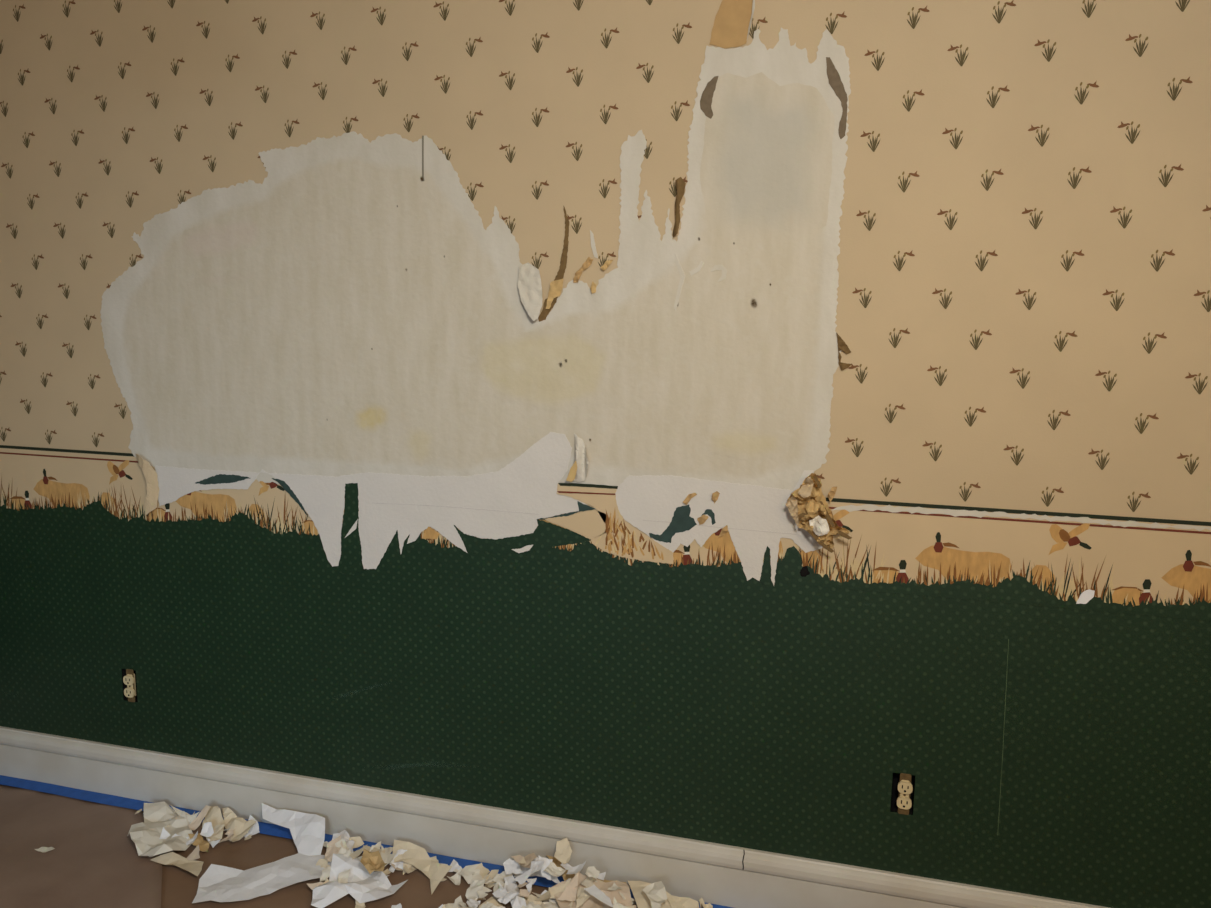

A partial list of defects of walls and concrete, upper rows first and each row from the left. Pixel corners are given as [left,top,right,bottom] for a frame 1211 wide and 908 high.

spalling [700,76,718,119]
spalling [826,57,848,139]
flaking render [120,153,828,585]